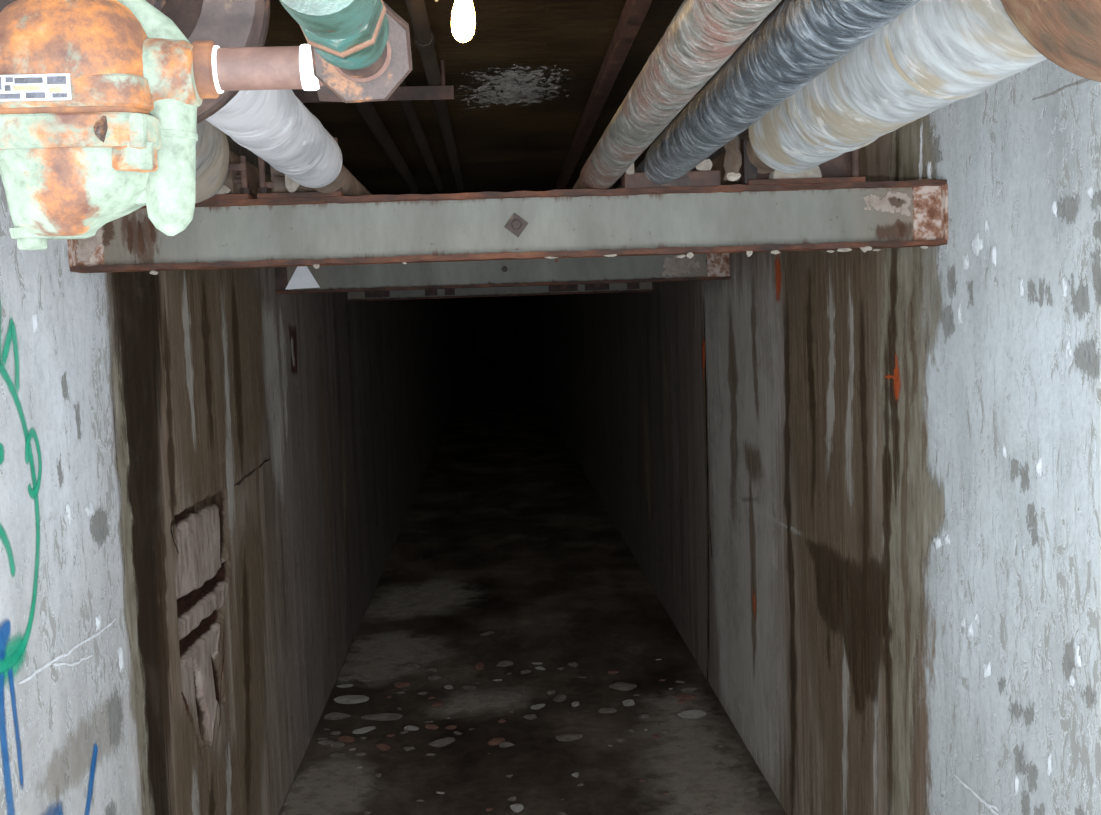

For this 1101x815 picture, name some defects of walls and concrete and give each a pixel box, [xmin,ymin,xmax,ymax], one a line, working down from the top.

damp [888,115,936,181]
rust [122,215,158,264]
rust [876,220,911,239]
peeling [1063,335,1101,380]
peeling [1002,444,1042,548]
damp [702,247,945,815]
spalling [170,459,270,786]
peeling [983,660,1036,726]
peeling [1062,641,1099,709]
peeling [1013,742,1052,815]